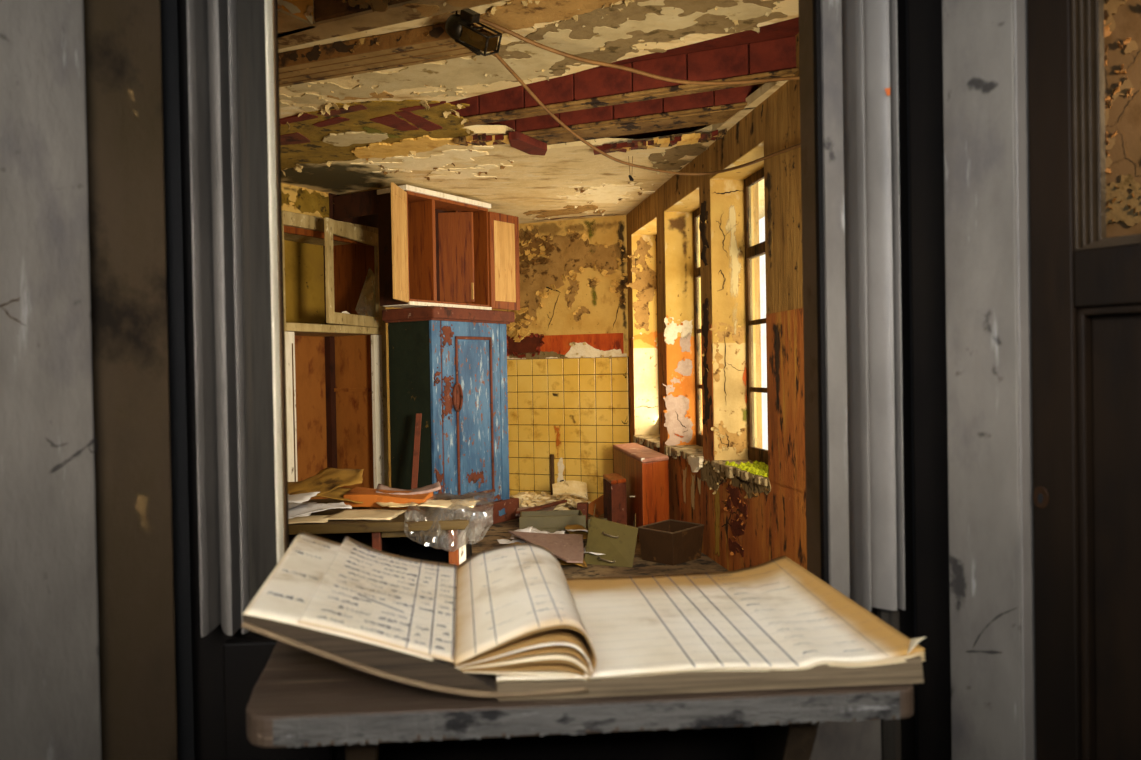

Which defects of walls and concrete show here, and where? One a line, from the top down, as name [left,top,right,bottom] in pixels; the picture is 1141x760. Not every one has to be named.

peeling [281,187,334,218]
peeling [350,144,514,181]
peeling [277,0,788,145]
peeling [1104,0,1141,227]
peeling [506,143,771,557]